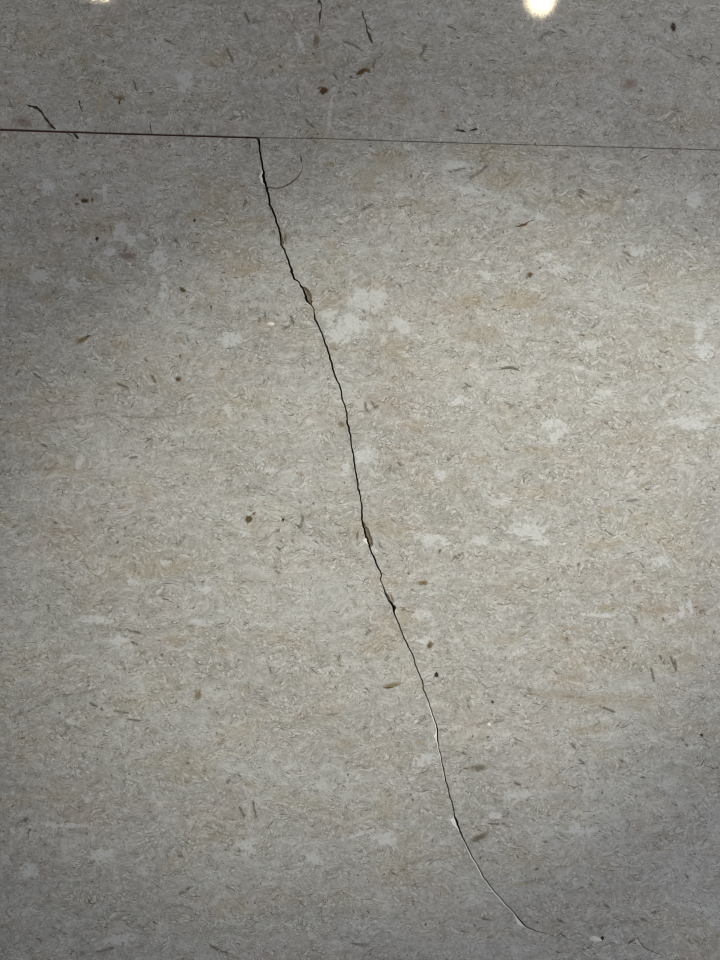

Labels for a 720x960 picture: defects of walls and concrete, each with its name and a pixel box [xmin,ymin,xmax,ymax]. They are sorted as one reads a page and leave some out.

crack [257,140,571,940]